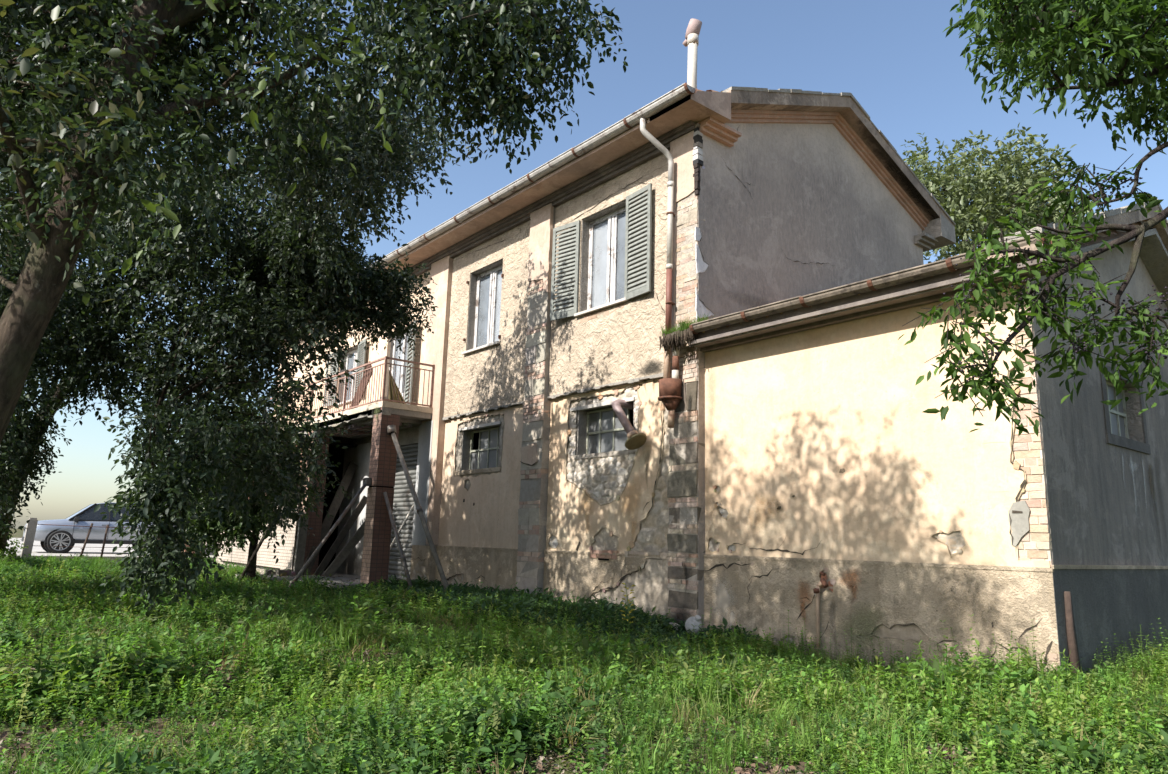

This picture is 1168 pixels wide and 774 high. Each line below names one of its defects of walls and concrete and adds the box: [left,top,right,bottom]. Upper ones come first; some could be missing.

peeling [695,227,709,273]
peeling [695,288,714,320]
peeling [565,383,642,506]
peeling [1007,336,1027,499]
peeling [563,404,669,618]
crack [577,564,645,602]
crack [704,537,820,601]
flaking render [930,529,969,558]